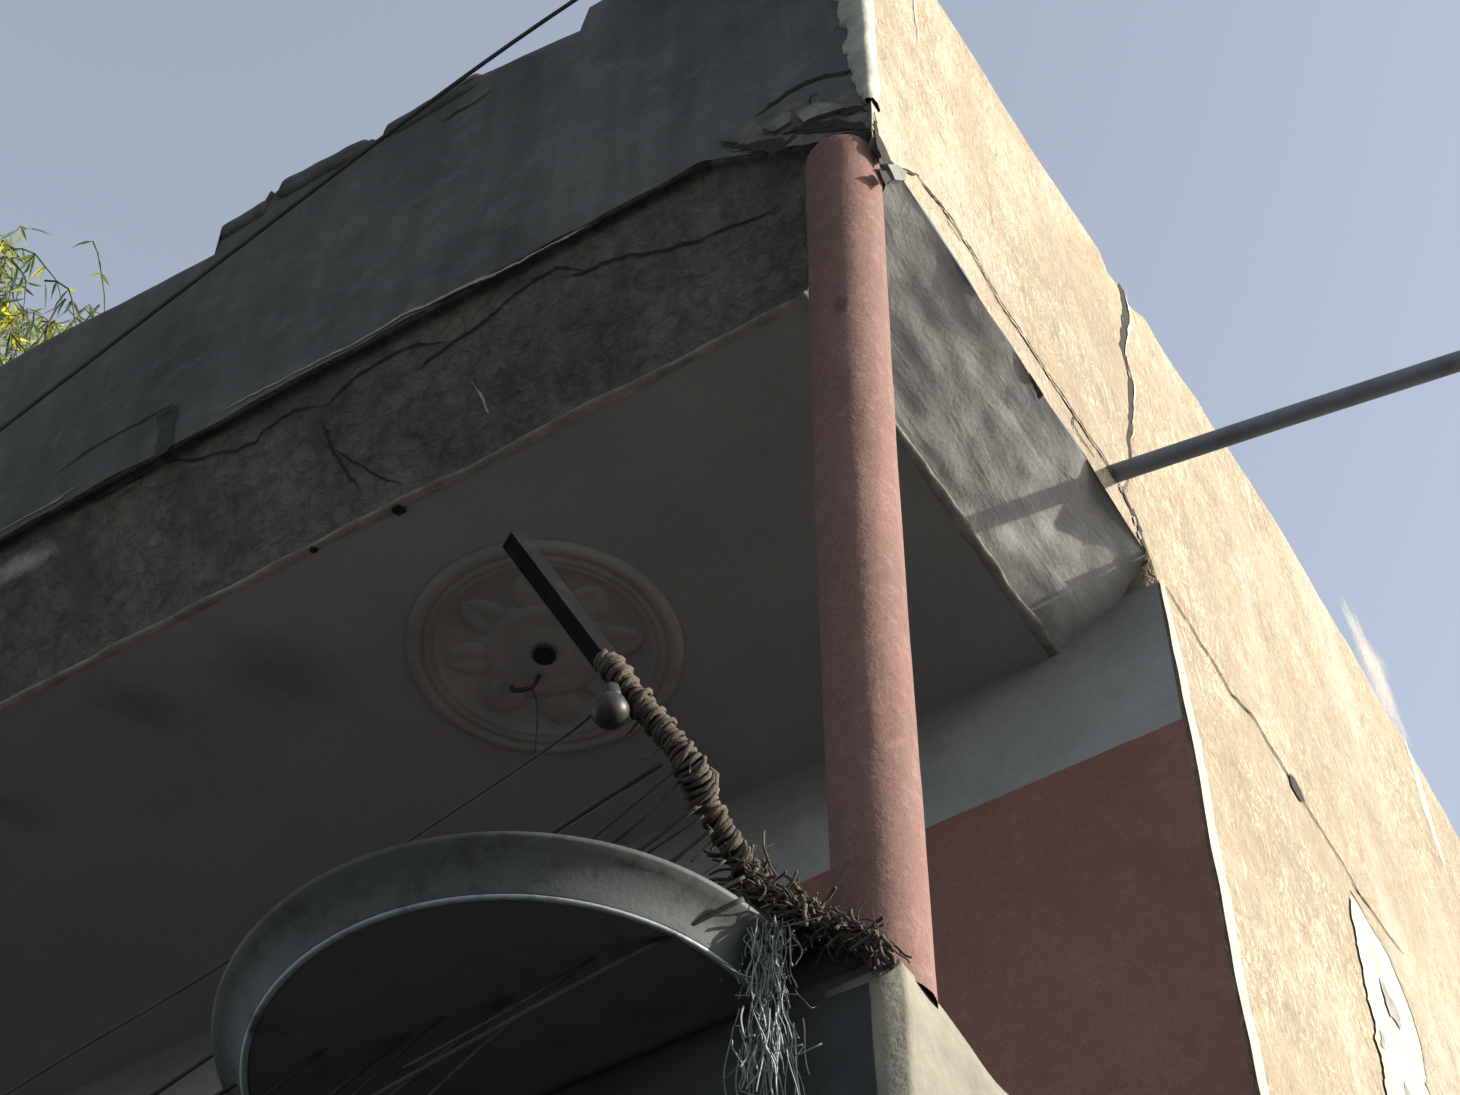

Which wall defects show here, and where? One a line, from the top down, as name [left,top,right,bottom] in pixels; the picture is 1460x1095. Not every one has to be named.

spalling [720,0,907,185]
crack [57,404,174,474]
crack [94,211,774,502]
crack [719,69,1136,479]
crack [1166,587,1404,954]
peeling [1350,890,1431,1095]